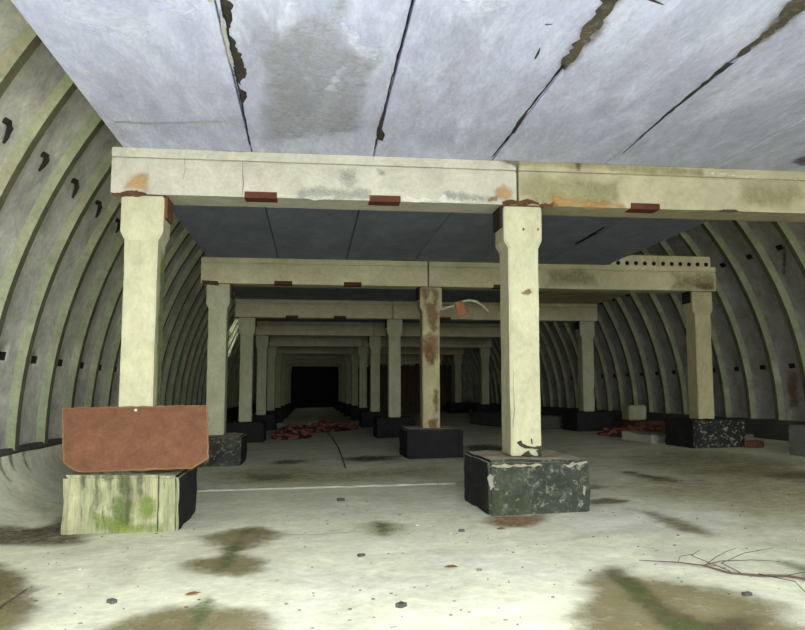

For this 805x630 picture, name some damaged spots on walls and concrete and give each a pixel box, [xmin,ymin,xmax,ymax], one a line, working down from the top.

crack [220,0,250,193]
leakage [268,22,380,136]
crack [374,0,413,149]
corrosion [489,188,510,201]
corrosion [423,288,438,364]
leakage [95,471,143,511]
leakage [185,527,278,575]
leakage [0,569,31,630]
leakage [106,608,269,630]
leakage [576,570,804,630]